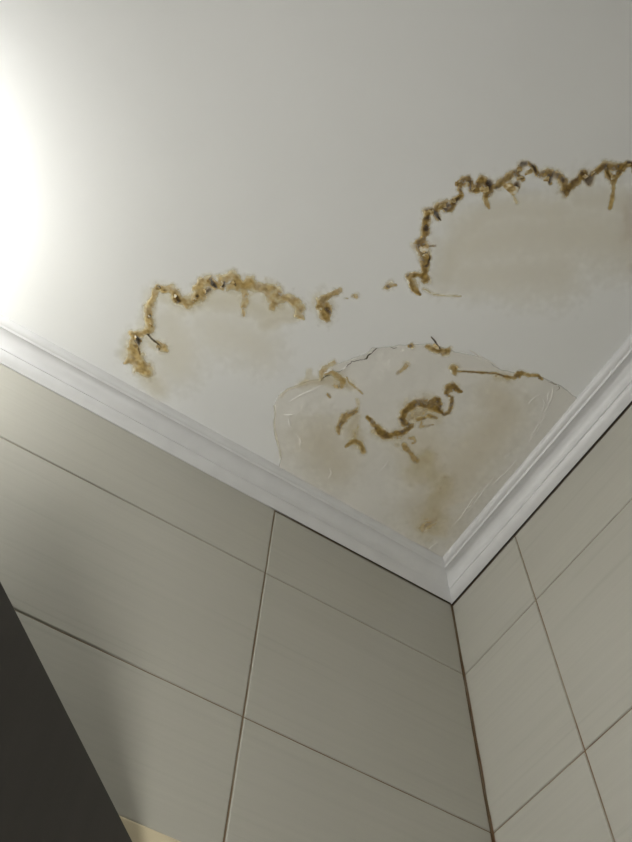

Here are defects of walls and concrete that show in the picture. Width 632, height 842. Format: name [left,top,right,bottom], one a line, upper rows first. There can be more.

water stain [406,161,632,296]
water stain [316,288,342,322]
water stain [123,271,305,377]
water stain [425,337,451,355]
water stain [336,410,357,435]
water stain [366,365,463,462]
water stain [345,439,366,454]